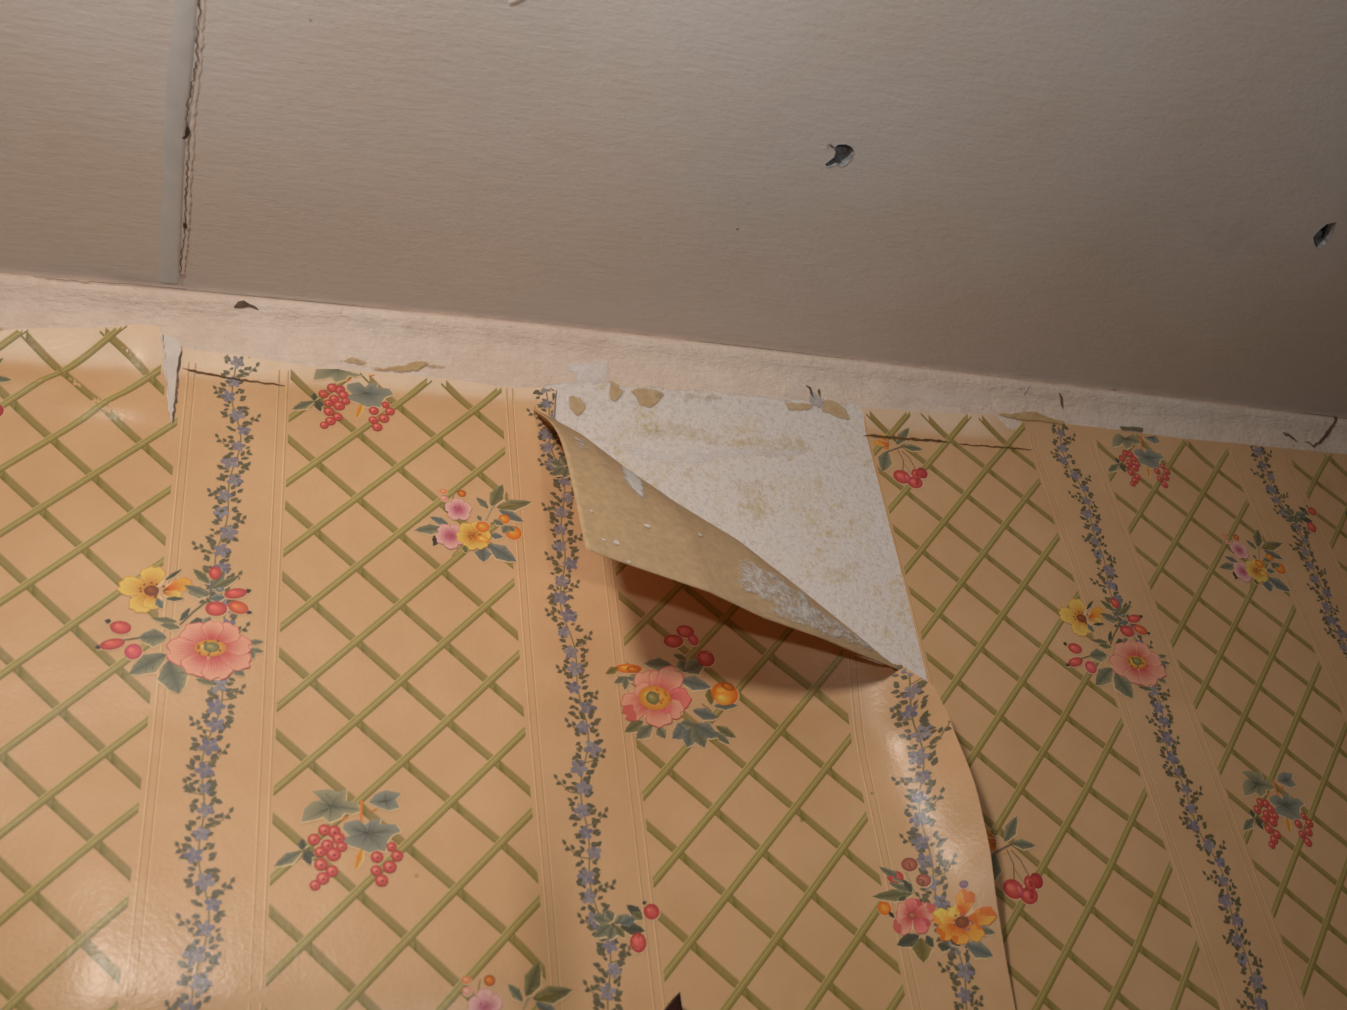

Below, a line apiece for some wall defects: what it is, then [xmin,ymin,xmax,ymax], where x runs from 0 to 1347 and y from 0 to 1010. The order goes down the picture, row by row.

crack [33,0,206,290]
spalling [825,144,854,167]
spalling [1313,222,1336,249]
flaking render [533,360,928,681]